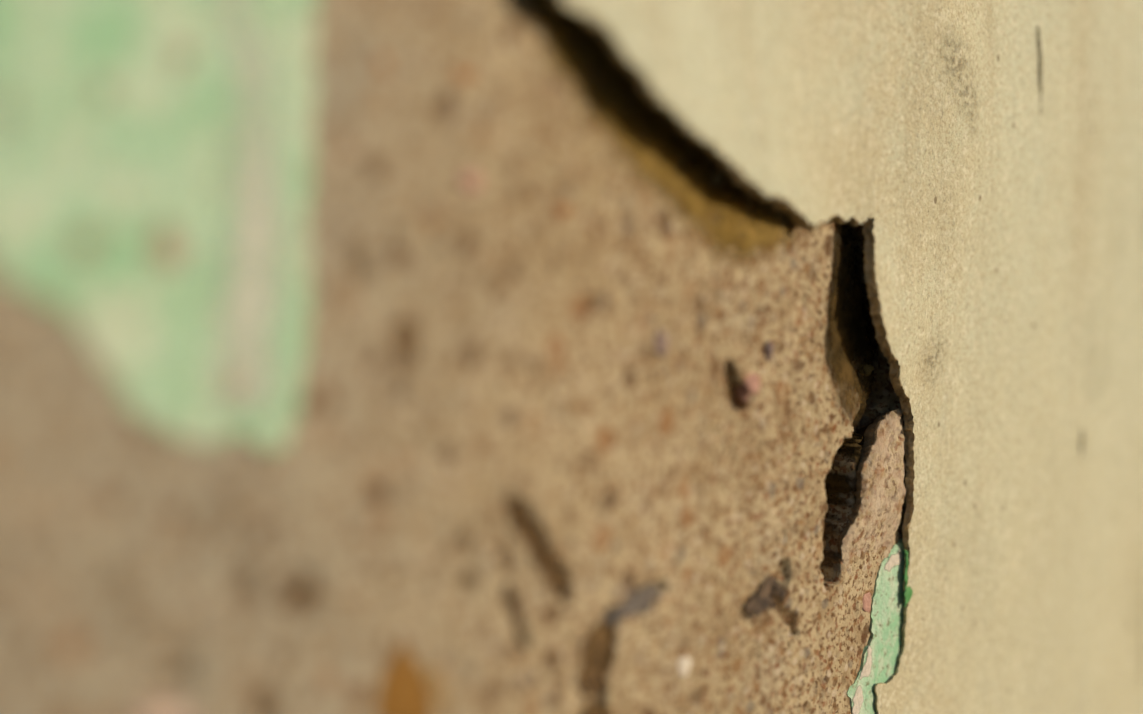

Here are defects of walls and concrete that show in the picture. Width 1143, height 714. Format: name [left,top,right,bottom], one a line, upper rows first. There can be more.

peeling [0,0,318,453]
spalling [396,320,418,363]
peeling [554,0,947,714]
spalling [504,502,570,597]
crack [820,432,863,568]